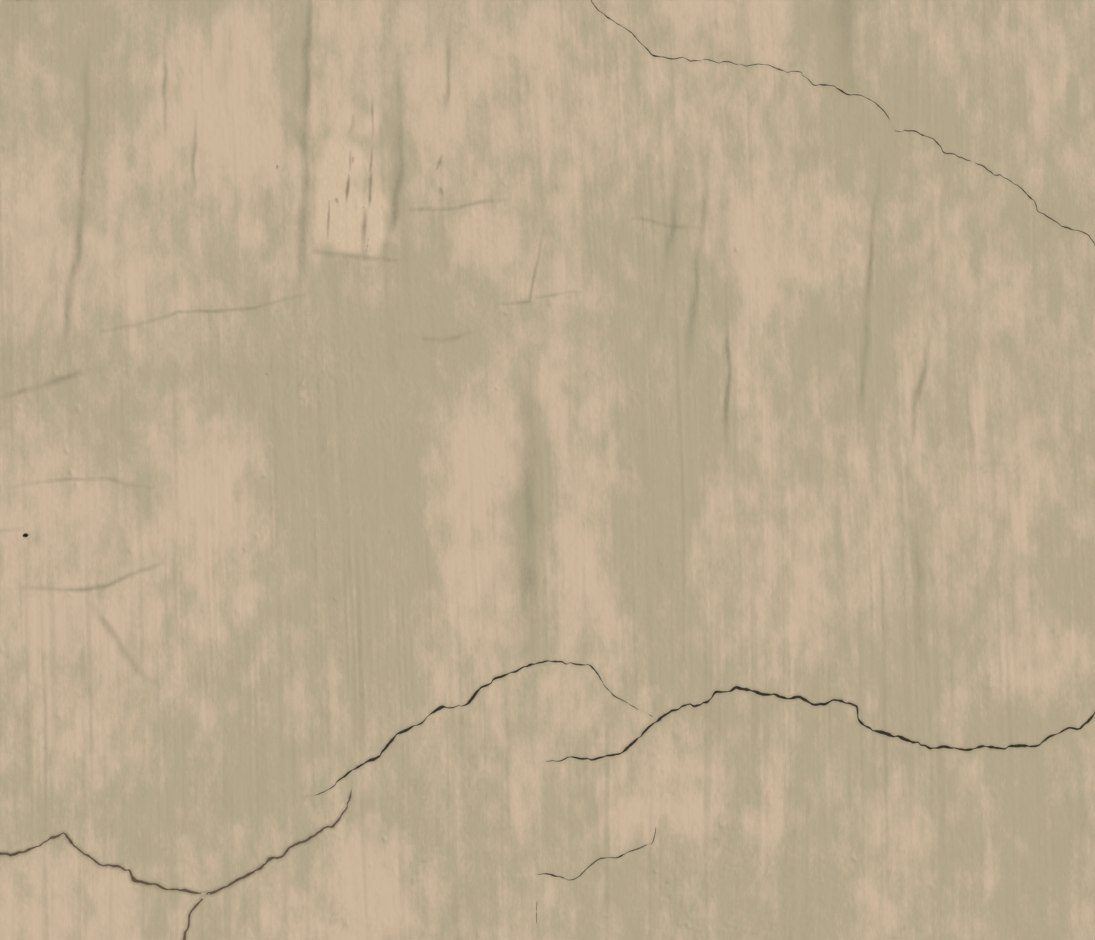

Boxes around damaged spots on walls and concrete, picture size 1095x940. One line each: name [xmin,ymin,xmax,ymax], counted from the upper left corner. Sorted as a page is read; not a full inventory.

crack [588,0,1095,248]
crack [407,196,512,214]
crack [312,246,404,265]
crack [494,227,546,307]
crack [0,657,1095,940]